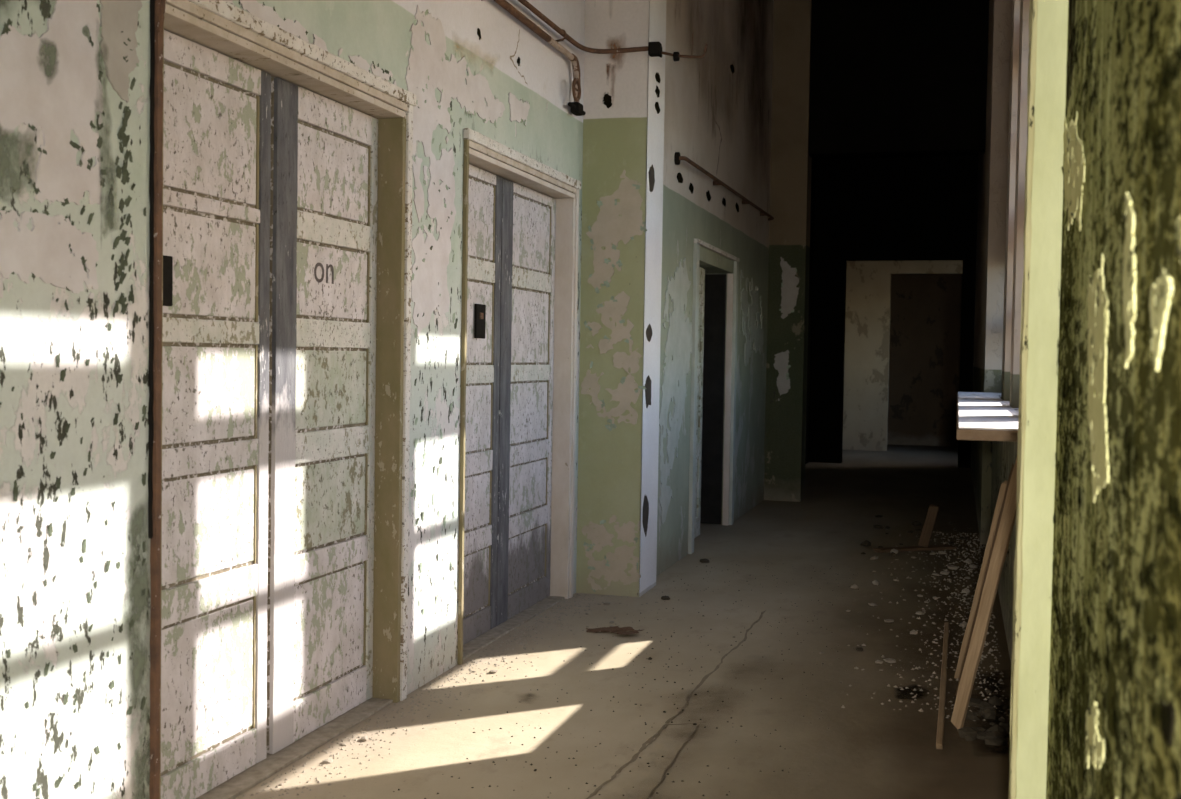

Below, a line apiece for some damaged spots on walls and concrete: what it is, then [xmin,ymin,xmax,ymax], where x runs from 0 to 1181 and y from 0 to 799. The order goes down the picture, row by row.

peeling [0,0,146,331]
peeling [225,0,530,338]
peeling [1062,111,1086,231]
peeling [56,353,67,382]
peeling [581,164,693,537]
peeling [740,270,791,401]
peeling [779,257,799,319]
peeling [1087,192,1174,503]
peeling [87,560,121,605]
crack [586,610,766,799]
peeling [1085,700,1105,771]
spalling [1160,699,1176,747]